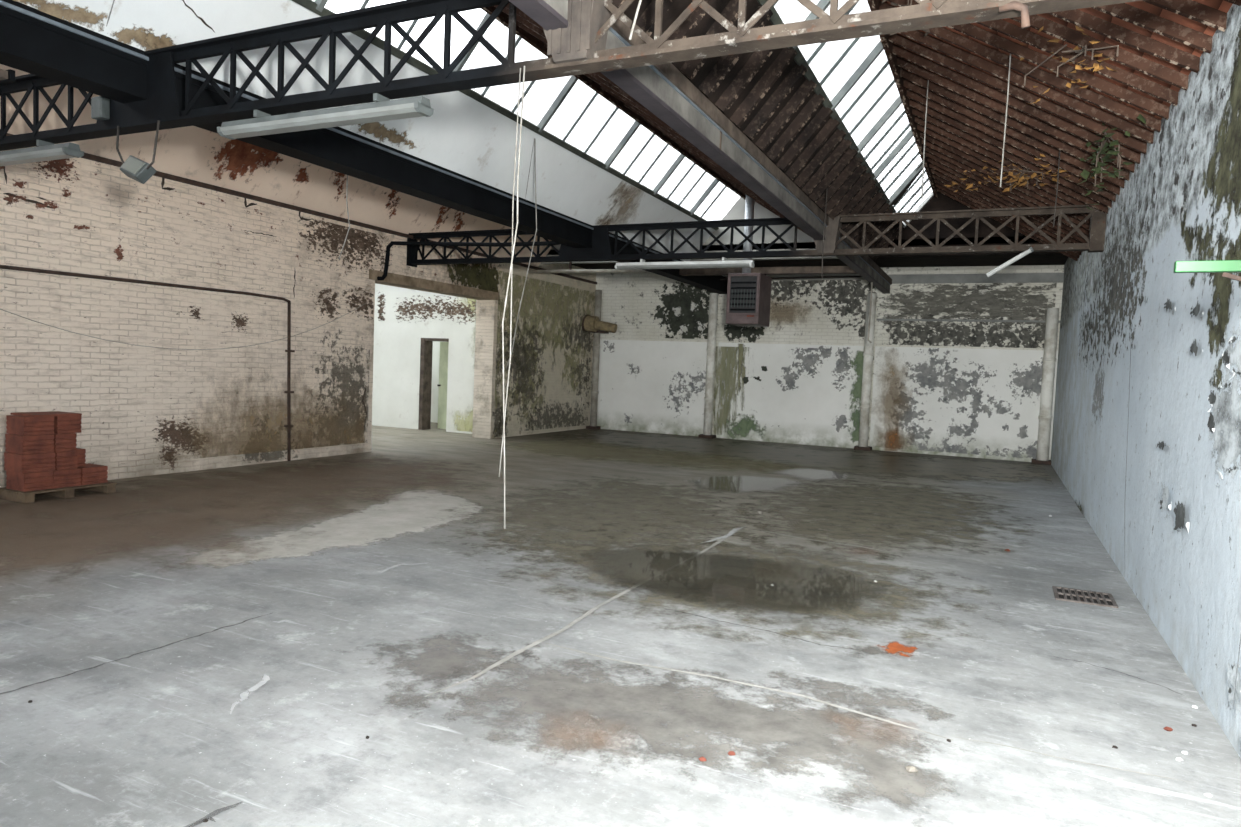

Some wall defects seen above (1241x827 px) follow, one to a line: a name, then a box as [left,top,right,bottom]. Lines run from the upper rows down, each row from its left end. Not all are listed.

crack [182,0,214,32]
peeling [298,218,476,324]
peeling [650,282,765,343]
peeling [1164,299,1204,316]
water stain [0,330,488,570]
peeling [665,370,706,418]
water stain [492,313,1051,484]
peeling [742,280,1045,459]
peeling [1207,324,1241,486]
peeling [1160,483,1190,532]
water stain [503,538,945,639]
peeling [1226,662,1241,717]